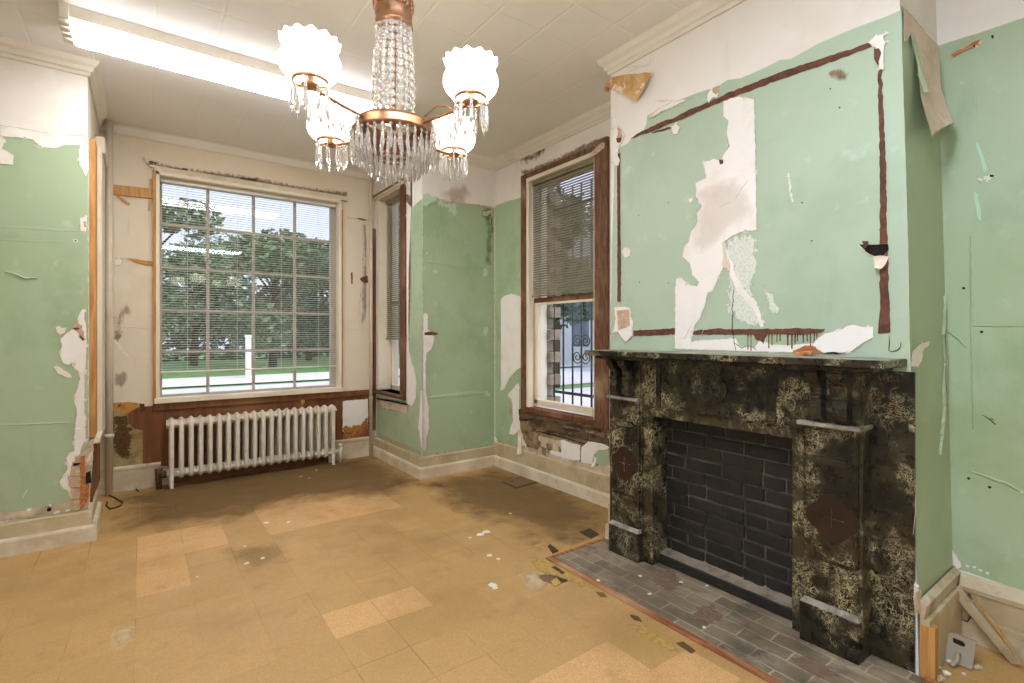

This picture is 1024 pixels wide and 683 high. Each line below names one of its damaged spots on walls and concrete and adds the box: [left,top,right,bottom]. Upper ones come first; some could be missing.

peeling [903,7,940,61]
peeling [0,125,90,175]
peeling [674,85,874,354]
peeling [366,202,438,451]
peeling [484,294,521,397]
flaking render [610,306,633,342]
peeling [49,309,94,514]
flaking render [509,407,610,467]